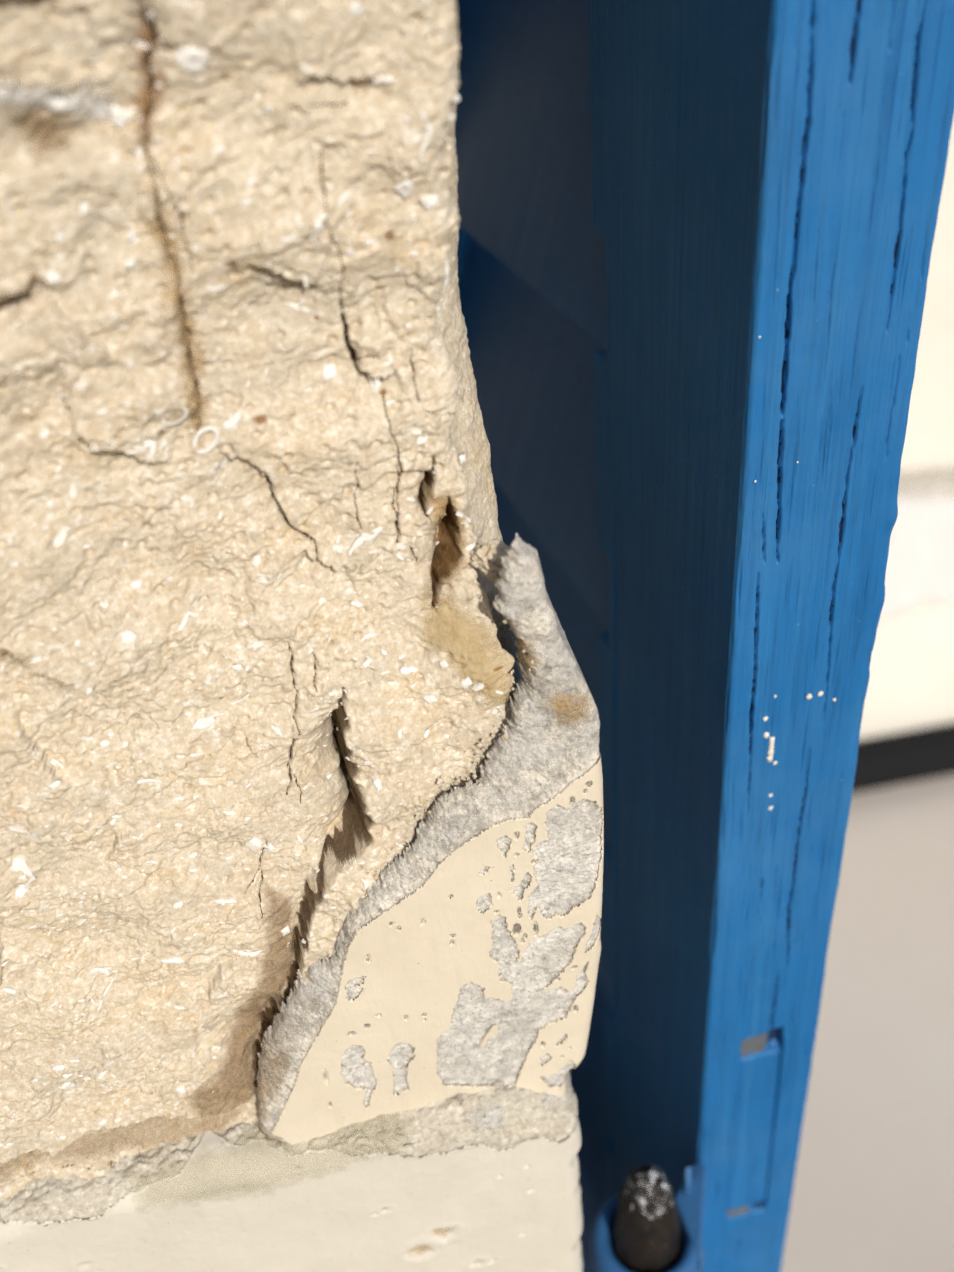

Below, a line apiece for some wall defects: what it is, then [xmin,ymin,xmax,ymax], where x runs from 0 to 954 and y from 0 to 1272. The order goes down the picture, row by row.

rust [140,78,158,126]
crack [140,0,201,431]
crack [320,150,419,403]
crack [849,0,860,74]
spalling [0,0,519,1200]
crack [265,473,318,560]
crack [382,395,461,606]
crack [762,271,792,551]
crack [829,500,845,621]
crack [245,841,267,919]
crack [253,643,372,1090]
peeling [437,781,602,1085]